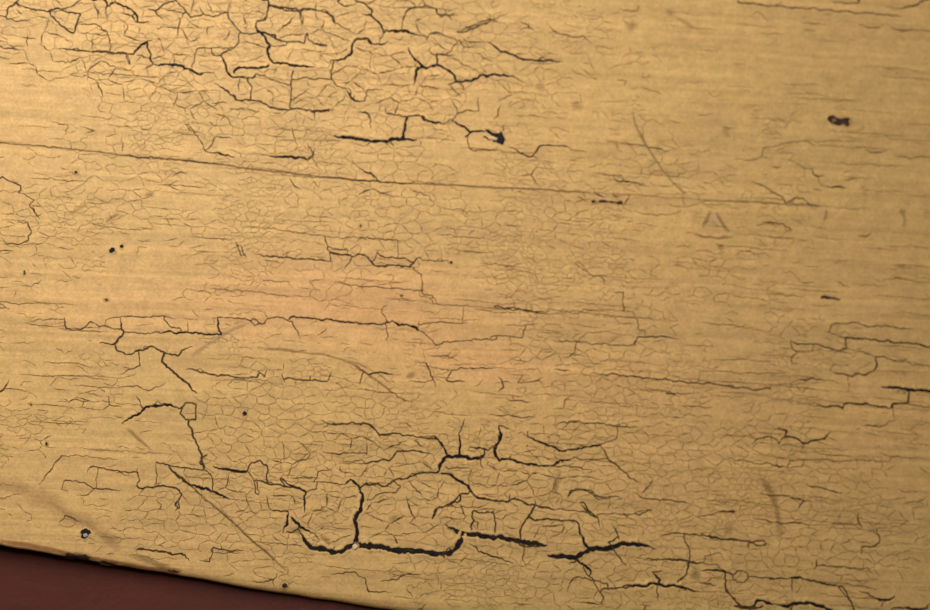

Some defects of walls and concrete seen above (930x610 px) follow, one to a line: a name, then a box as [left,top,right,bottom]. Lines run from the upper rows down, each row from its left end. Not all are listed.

crack [0,0,590,216]
crack [609,140,668,152]
crack [0,157,40,251]
crack [577,173,682,216]
crack [31,227,930,610]